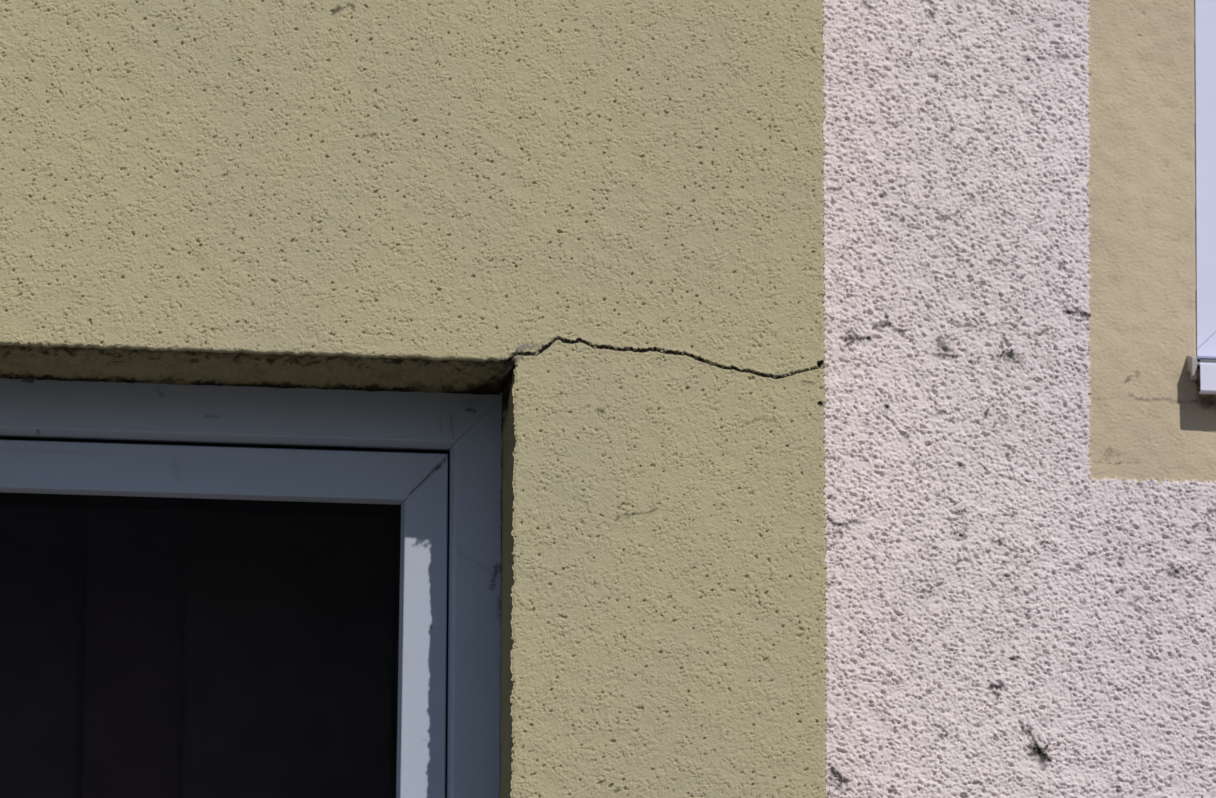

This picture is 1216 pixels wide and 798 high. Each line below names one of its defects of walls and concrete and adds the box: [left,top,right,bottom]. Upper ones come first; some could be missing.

crack [509,338,820,379]